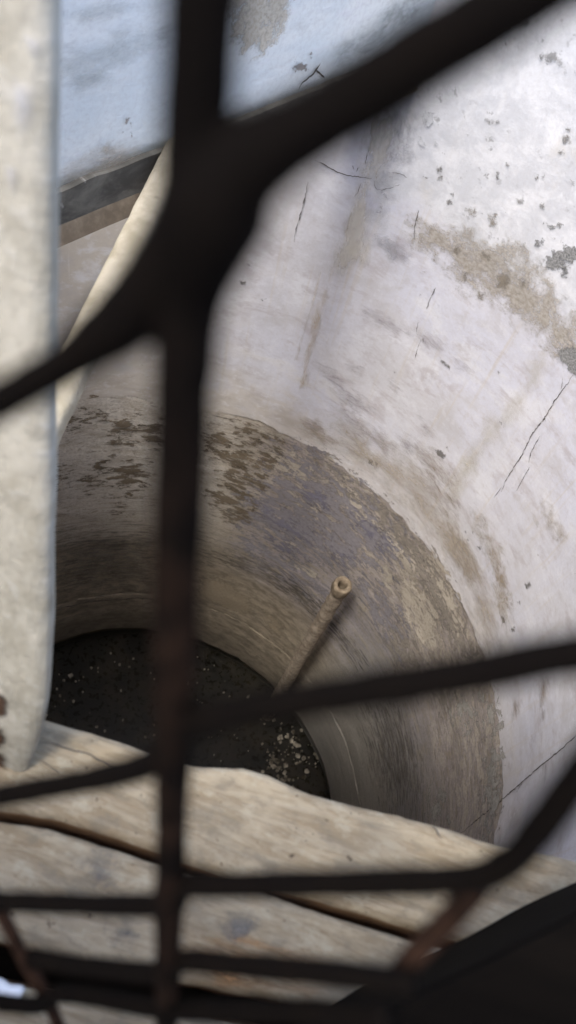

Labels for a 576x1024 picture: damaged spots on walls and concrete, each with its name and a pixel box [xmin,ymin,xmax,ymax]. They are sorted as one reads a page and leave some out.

crack [495,375,573,496]